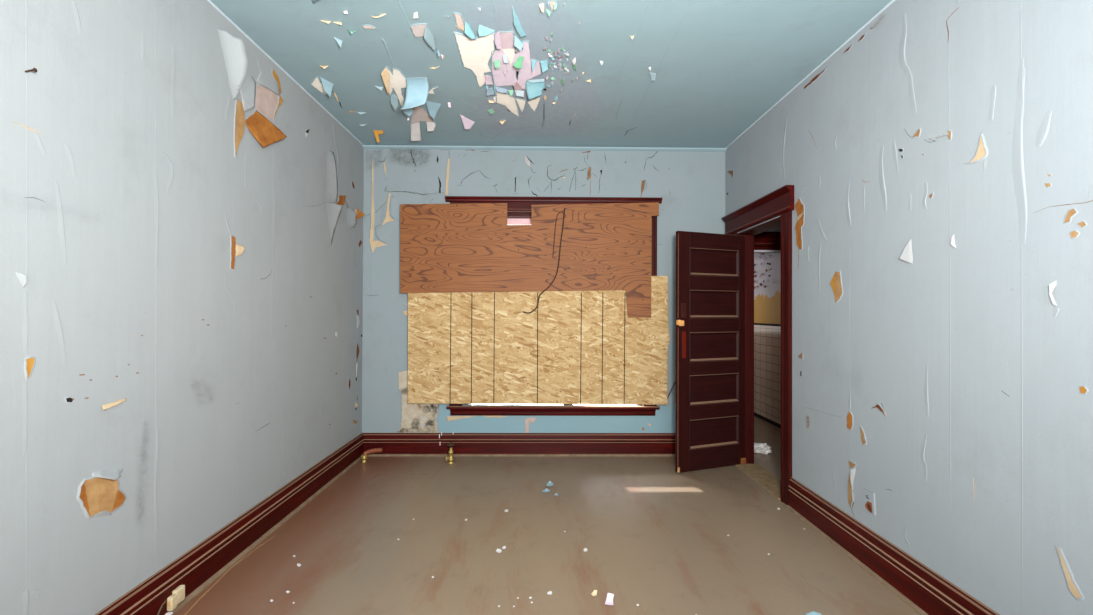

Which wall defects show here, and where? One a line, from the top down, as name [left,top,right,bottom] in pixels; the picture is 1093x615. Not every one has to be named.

peeling [539,0,565,17]
peeling [235,70,283,154]
peeling [310,10,475,143]
peeling [443,6,584,125]
crack [364,105,606,217]
peeling [358,159,394,253]
peeling [830,272,842,302]
flaking render [396,370,675,433]
peeling [84,477,123,517]
peeling [1057,548,1082,599]